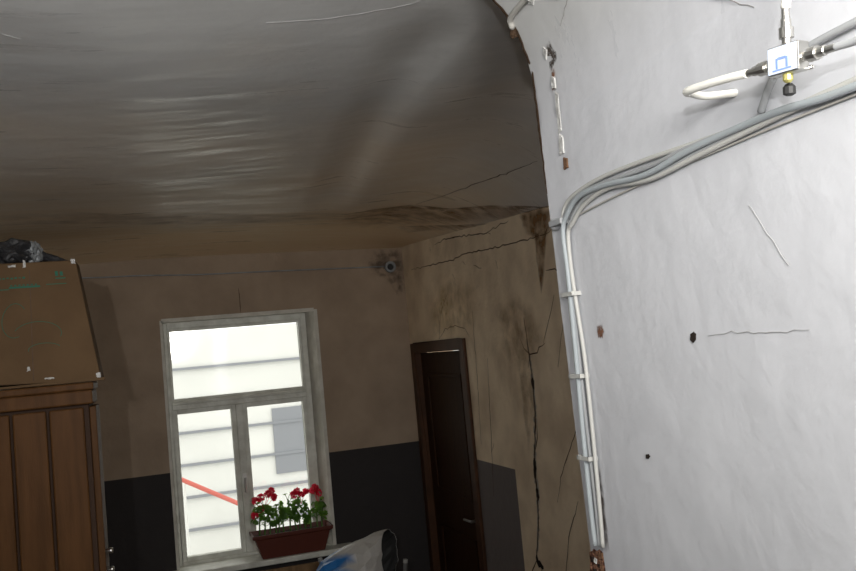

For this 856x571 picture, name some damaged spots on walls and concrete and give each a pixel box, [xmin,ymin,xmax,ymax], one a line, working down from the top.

crack [269,0,421,23]
crack [412,221,551,277]
water stain [523,209,549,255]
crack [709,329,793,337]
crack [521,297,578,571]